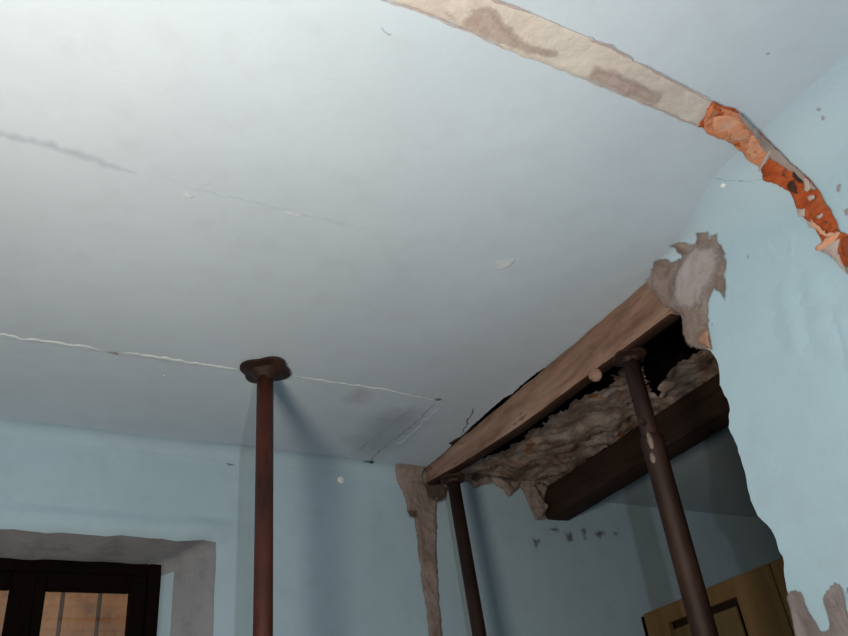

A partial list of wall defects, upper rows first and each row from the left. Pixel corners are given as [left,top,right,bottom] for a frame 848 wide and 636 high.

leakage [464,10,556,56]
leakage [590,70,659,103]
crack [0,333,240,371]
spalling [639,314,704,397]
crack [290,375,442,401]
spalling [443,368,544,454]
spalling [483,366,622,458]
peeling [646,431,656,463]
flaking render [787,583,848,636]